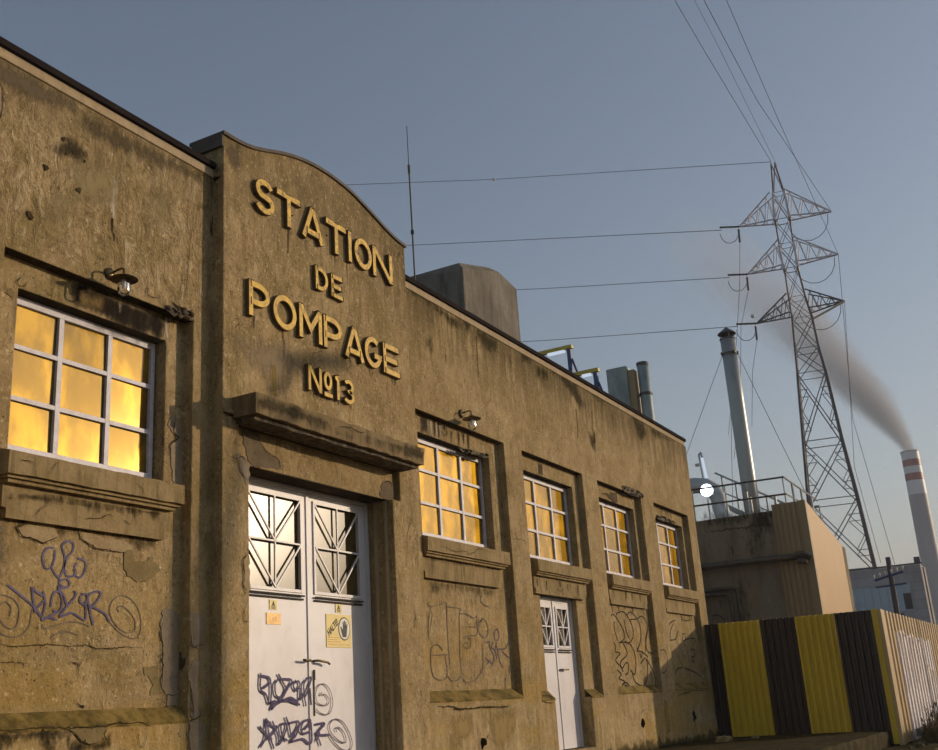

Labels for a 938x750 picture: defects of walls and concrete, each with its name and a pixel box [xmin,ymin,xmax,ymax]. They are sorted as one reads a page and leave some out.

damp [0,65,201,181]
peeling [16,522,59,544]
peeling [78,531,160,582]
crack [0,643,142,677]
peeling [143,608,206,750]
damp [0,729,60,750]
crack [0,699,153,750]
damp [68,736,111,750]